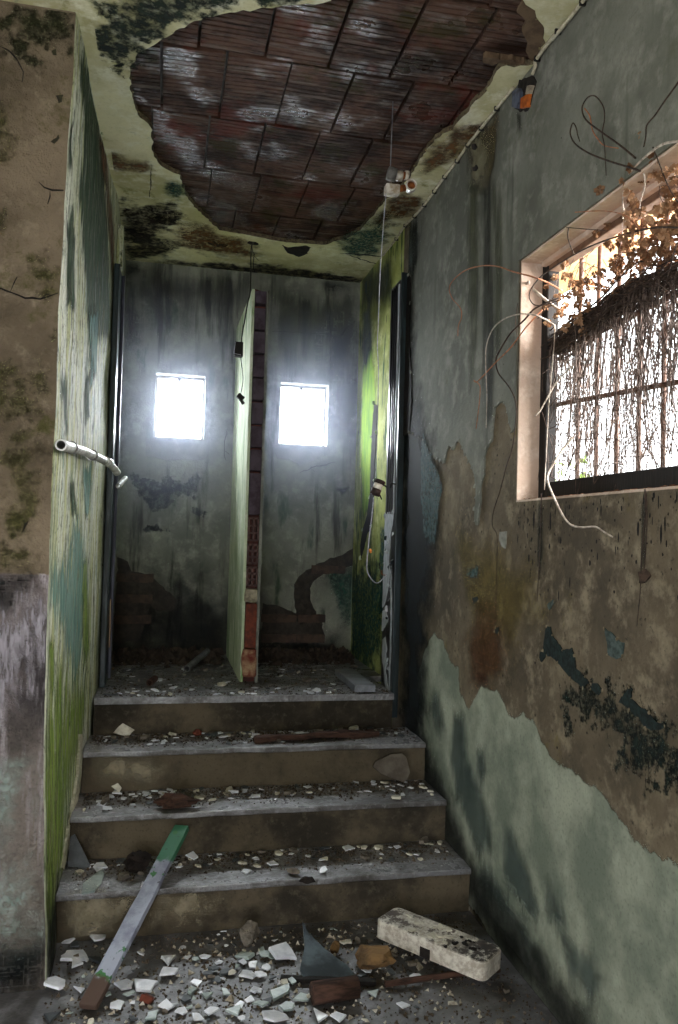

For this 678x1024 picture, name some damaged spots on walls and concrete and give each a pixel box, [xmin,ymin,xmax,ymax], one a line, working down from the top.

damp [93,0,238,77]
damp [257,0,300,8]
damp [67,207,75,312]
damp [100,135,371,437]
damp [374,193,421,267]
damp [60,374,68,437]
spalling [261,401,377,643]
peeling [499,531,507,549]
spalling [114,557,176,645]
spalling [538,625,603,695]
damp [401,392,678,1024]
spalling [619,685,665,731]